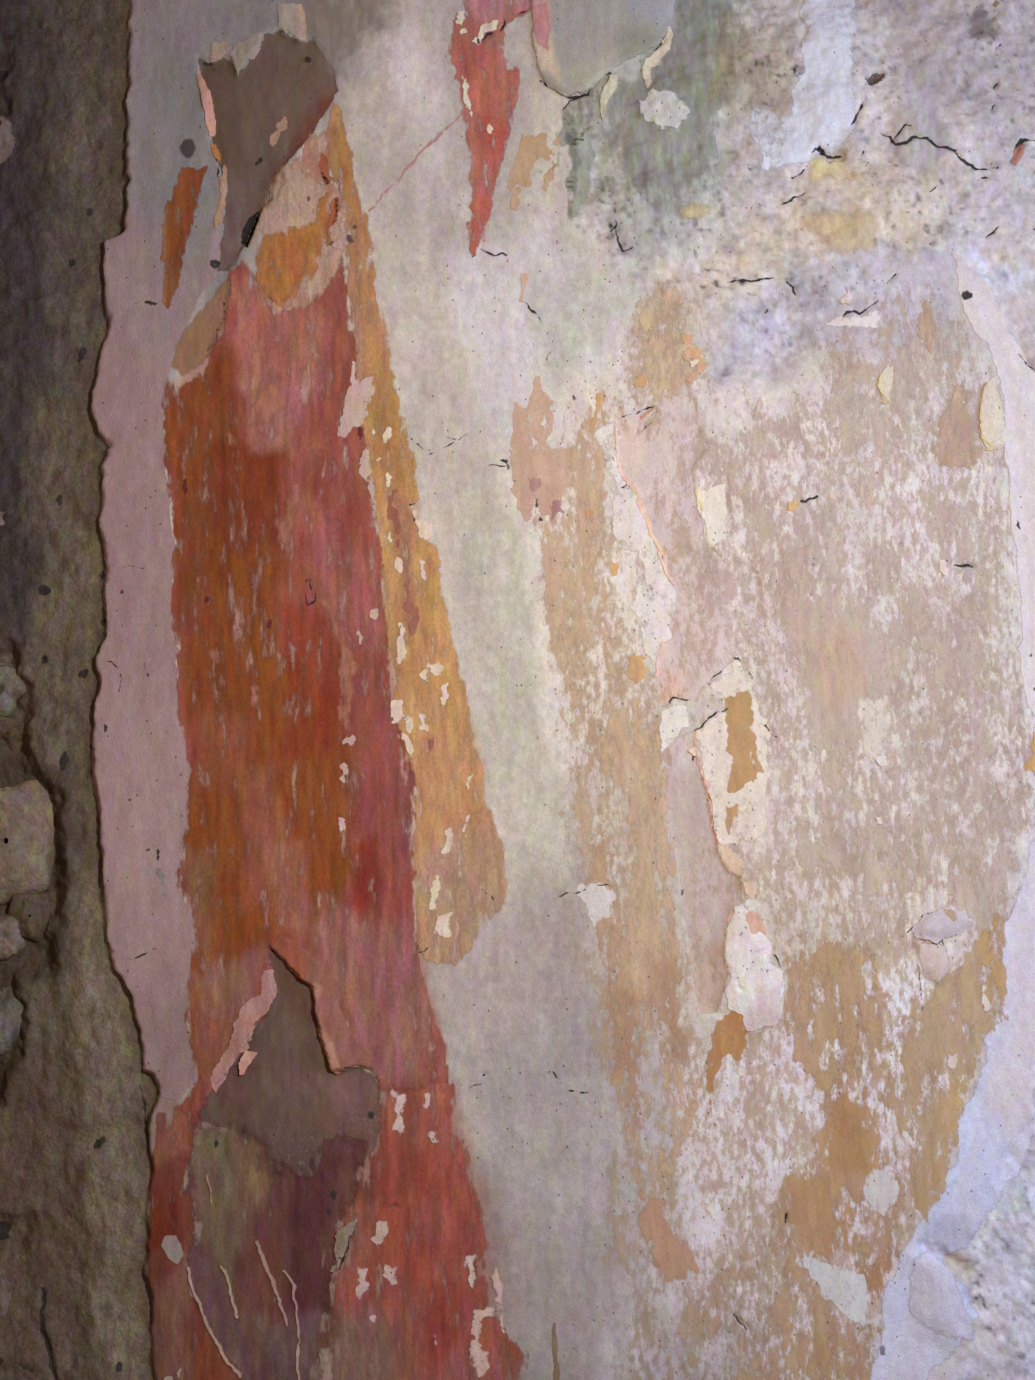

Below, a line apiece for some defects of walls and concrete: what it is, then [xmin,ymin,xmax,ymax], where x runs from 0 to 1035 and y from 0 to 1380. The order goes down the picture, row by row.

leakage [558,0,749,218]
leakage [809,158,860,184]
crack [782,83,1035,205]
leakage [890,25,950,170]
leakage [805,210,874,251]
flaking render [979,377,1011,451]
flaking render [0,0,382,1380]
flaking render [594,392,772,1014]
peeling [857,693,892,767]
peeling [576,882,616,927]
peeling [863,1165,899,1216]
peeling [795,1252,870,1326]